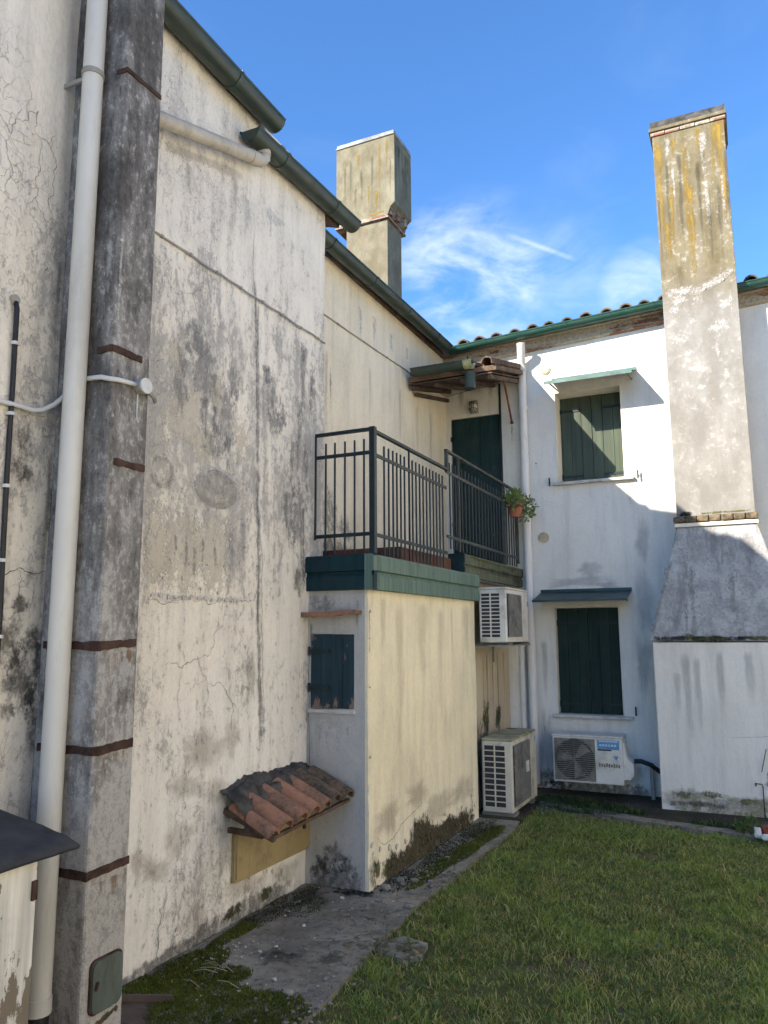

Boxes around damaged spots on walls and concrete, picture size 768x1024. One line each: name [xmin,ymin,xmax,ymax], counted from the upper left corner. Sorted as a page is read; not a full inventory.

crack [2,81,57,228]
crack [165,434,265,751]
water stain [296,846,373,902]